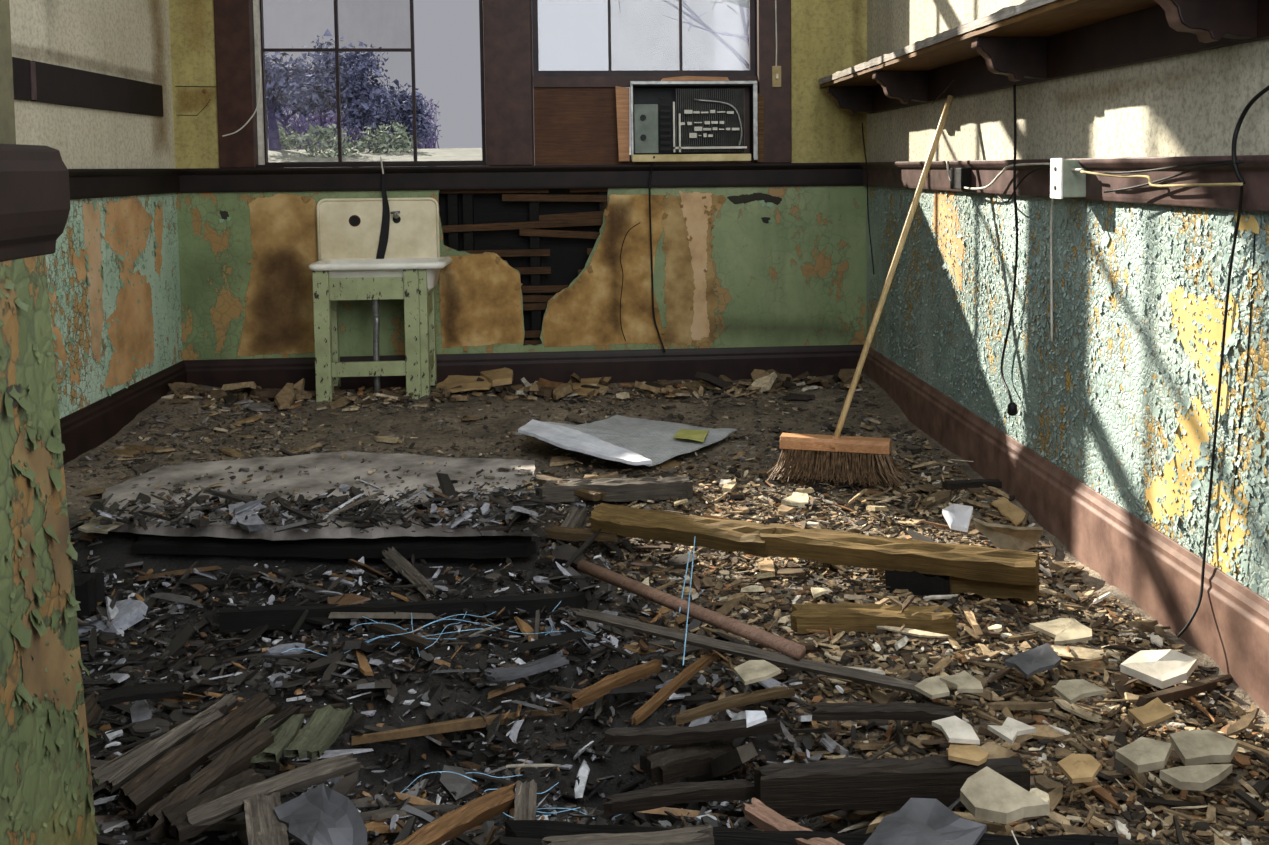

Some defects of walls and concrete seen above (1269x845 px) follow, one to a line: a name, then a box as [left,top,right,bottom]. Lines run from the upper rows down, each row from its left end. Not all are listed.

peeling [237,193,318,358]
water stain [259,255,303,346]
flaking render [438,254,524,352]
flaking render [543,190,727,350]
peeling [875,187,1269,593]
peeling [0,196,171,845]